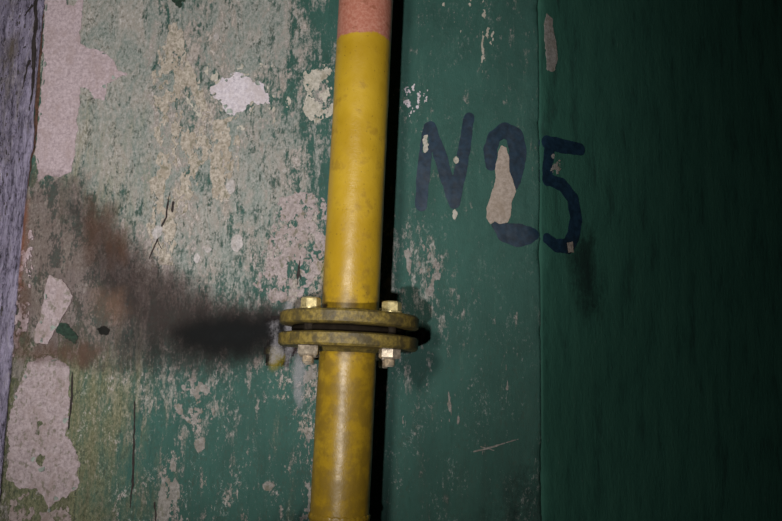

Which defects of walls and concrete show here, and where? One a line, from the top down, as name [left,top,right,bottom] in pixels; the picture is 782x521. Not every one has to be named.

spalling [544,14,558,72]
peeling [35,0,127,181]
peeling [303,64,335,123]
peeling [146,14,291,271]
peeling [486,146,516,224]
peeling [253,191,327,303]
peeling [12,230,74,357]
peeling [6,355,81,521]
peeling [157,458,183,521]
peeling [174,378,215,425]
peeling [194,437,206,453]
peeling [299,432,314,521]